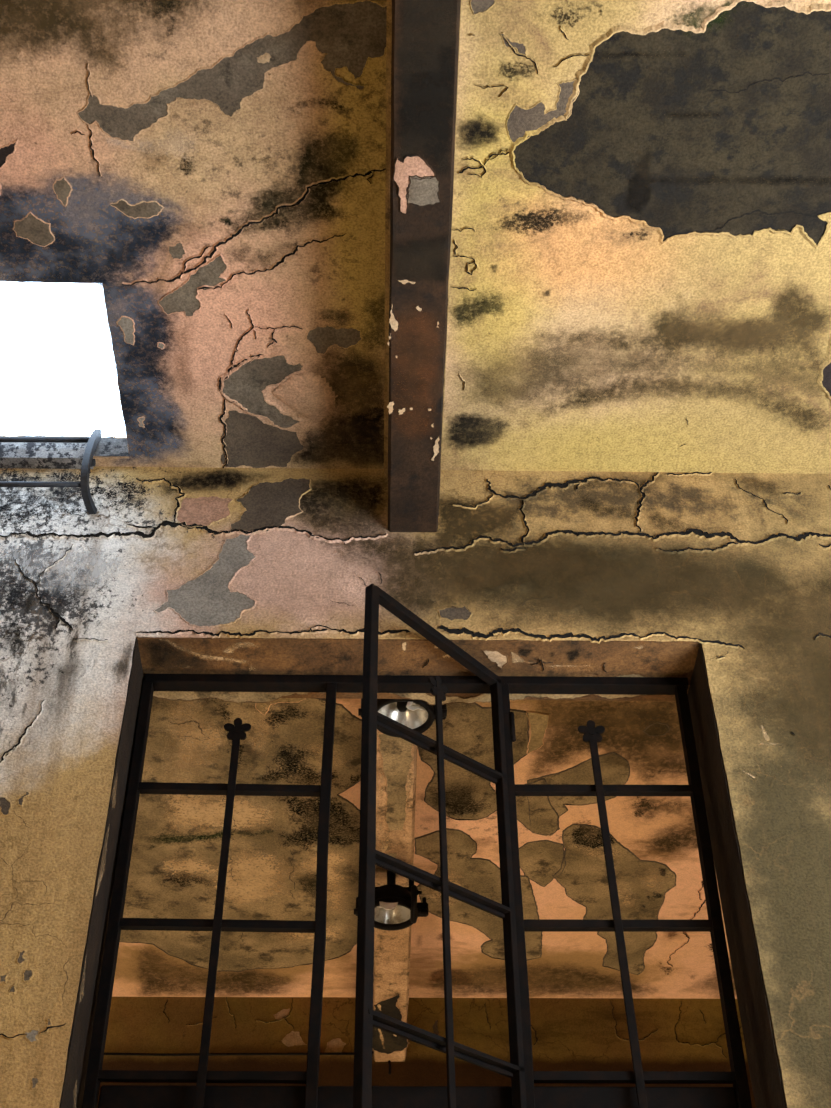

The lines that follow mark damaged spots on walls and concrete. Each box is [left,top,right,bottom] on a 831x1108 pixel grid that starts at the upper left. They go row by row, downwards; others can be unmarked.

flaking render [76,0,387,142]
flaking render [505,0,831,249]
crack [122,166,386,290]
peeling [392,154,442,215]
mould [452,296,503,324]
leakage [448,414,507,448]
leakage [0,549,117,653]
leakage [0,469,149,529]
crack [0,478,410,642]
flaking render [153,351,312,628]
crack [438,597,744,673]
crack [414,466,831,556]